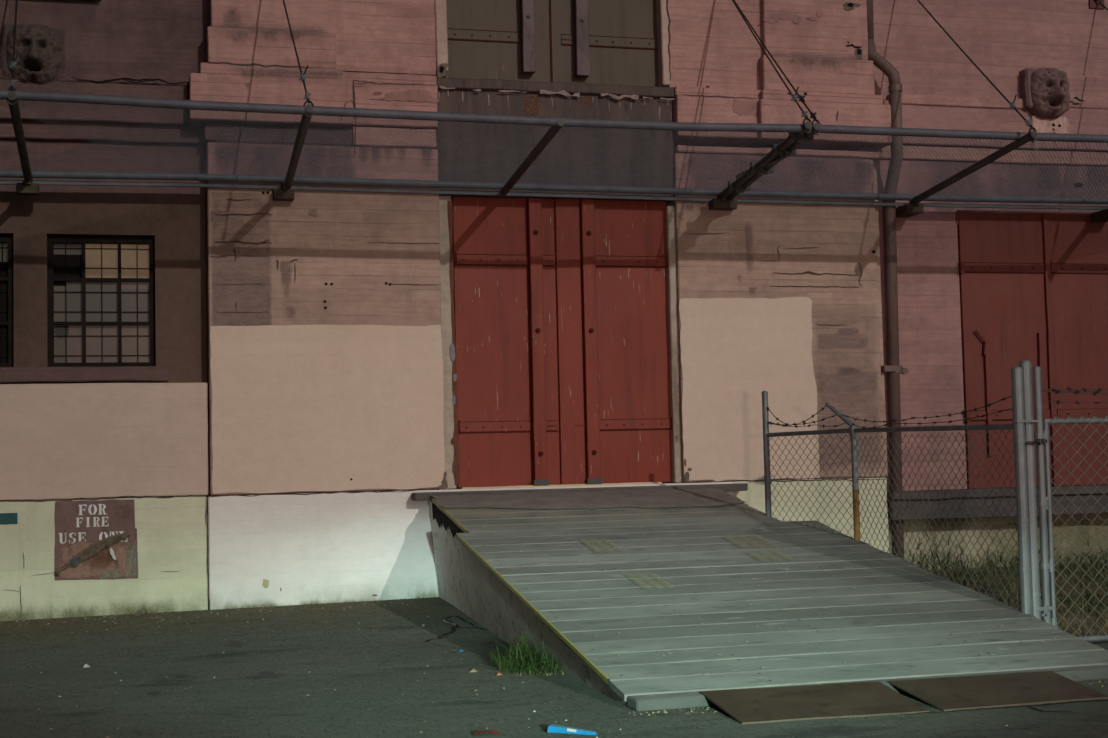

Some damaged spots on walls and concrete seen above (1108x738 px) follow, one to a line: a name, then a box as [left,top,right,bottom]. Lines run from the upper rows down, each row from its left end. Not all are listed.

crack [208,61,311,69]
crack [72,77,189,85]